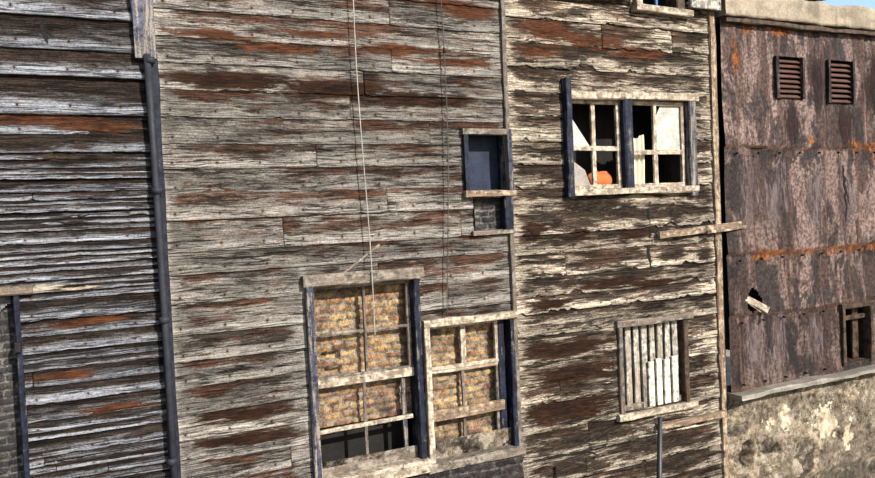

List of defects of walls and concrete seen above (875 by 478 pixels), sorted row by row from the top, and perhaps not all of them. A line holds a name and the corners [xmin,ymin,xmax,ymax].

spalling [0,296,11,312]